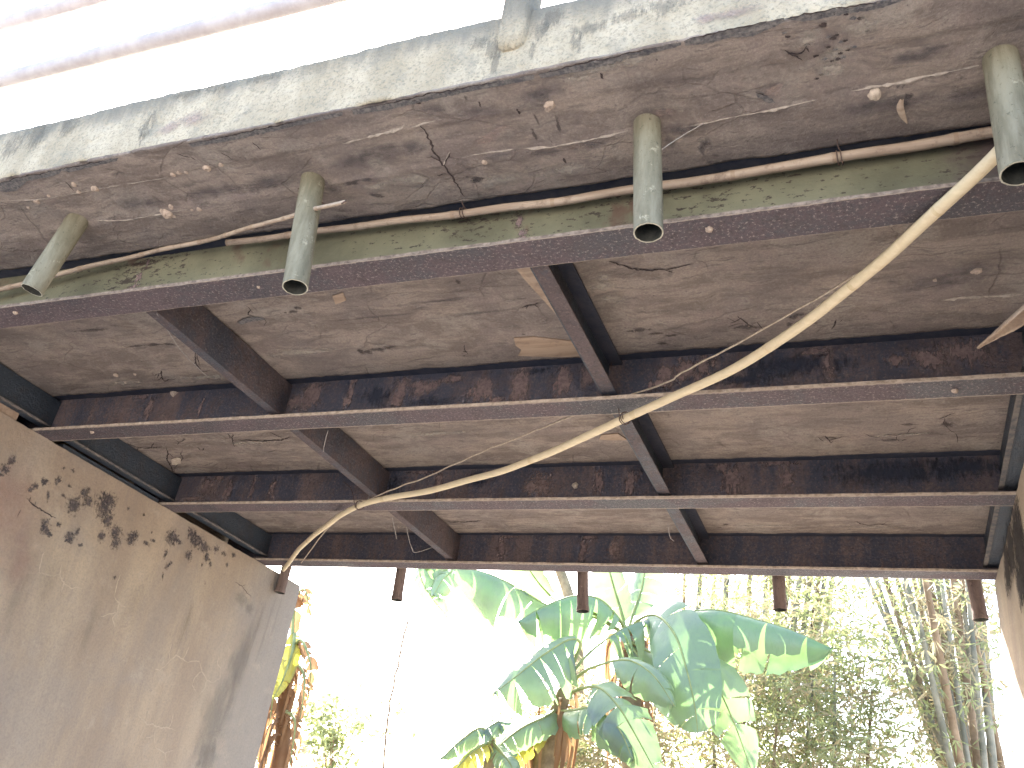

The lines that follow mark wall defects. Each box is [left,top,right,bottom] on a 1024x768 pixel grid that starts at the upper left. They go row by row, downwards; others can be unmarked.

crack [420,126,465,197]
crack [609,261,691,273]
corrosion [883,337,993,372]
corrosion [390,368,530,407]
corrosion [552,366,594,399]
corrosion [648,355,715,391]
crack [818,413,958,443]
corrosion [713,463,744,495]
damp [29,467,235,581]